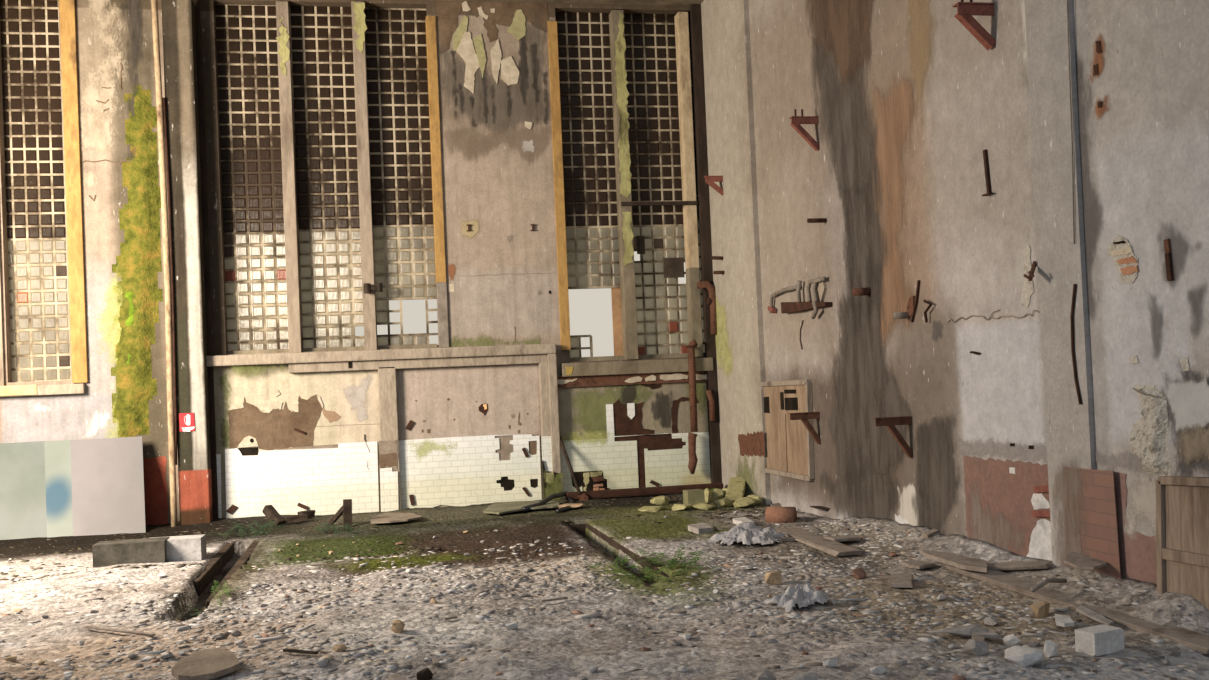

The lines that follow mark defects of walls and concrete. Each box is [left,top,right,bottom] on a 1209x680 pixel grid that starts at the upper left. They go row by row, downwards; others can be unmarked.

water stain [122,0,142,117]
flaking render [436,1,549,94]
water stain [806,0,873,83]
peeling [522,121,534,152]
water stain [1075,62,1100,314]
water stain [821,0,1047,535]
flaking render [228,389,341,456]
peeling [379,440,398,471]
water stain [1053,466,1086,570]
water stain [1095,450,1156,537]
flaking render [1130,385,1171,476]